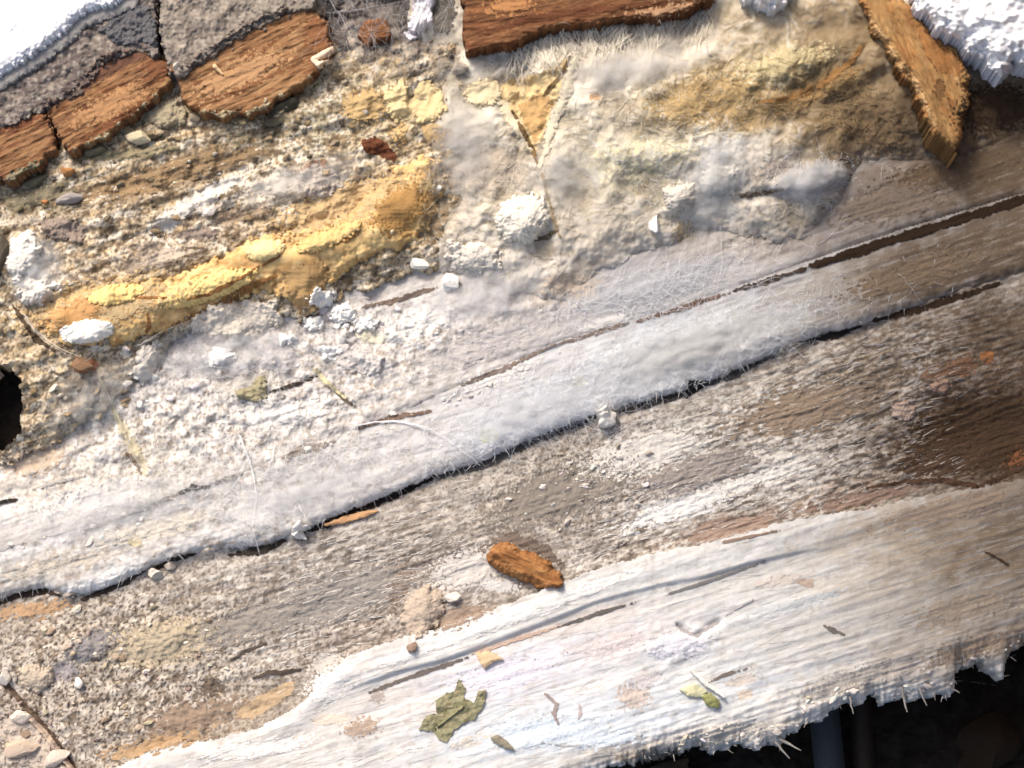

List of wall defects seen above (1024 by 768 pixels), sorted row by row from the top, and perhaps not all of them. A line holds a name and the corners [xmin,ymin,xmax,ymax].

spalling [98,4,158,48]
water stain [747,10,1024,234]
water stain [0,137,300,278]
spalling [295,163,344,199]
crack [12,306,56,352]
crack [362,282,463,309]
crack [460,195,1024,386]
hole [0,368,23,451]
water stain [0,185,994,684]
crack [228,354,772,557]
water stain [866,484,1024,535]
crack [0,553,196,605]